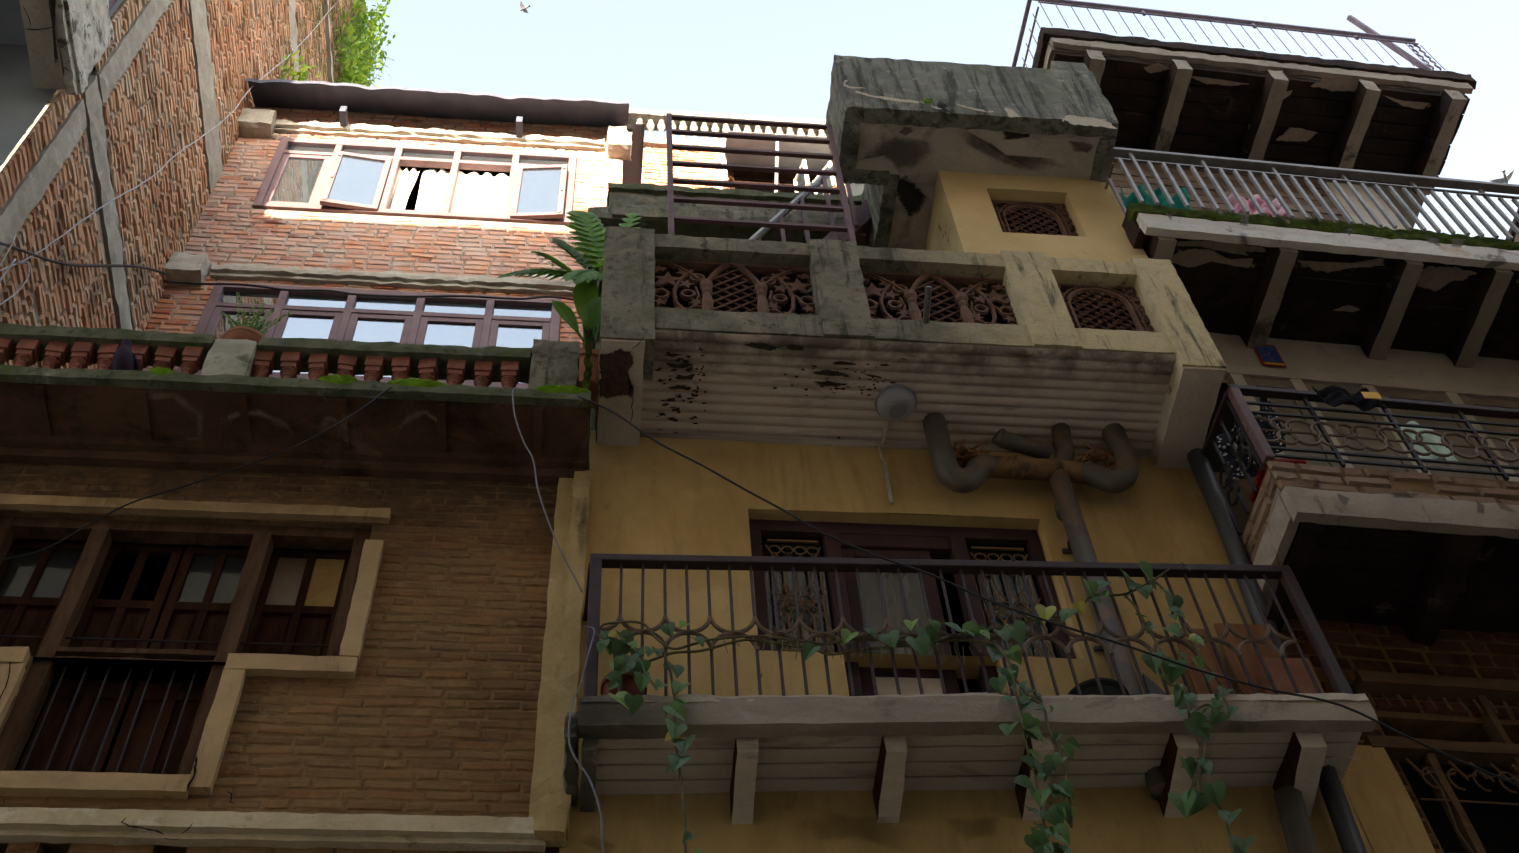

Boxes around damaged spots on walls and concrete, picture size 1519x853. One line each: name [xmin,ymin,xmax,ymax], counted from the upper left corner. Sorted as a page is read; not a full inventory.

spalling [598,349,634,401]
peeling [655,341,707,433]